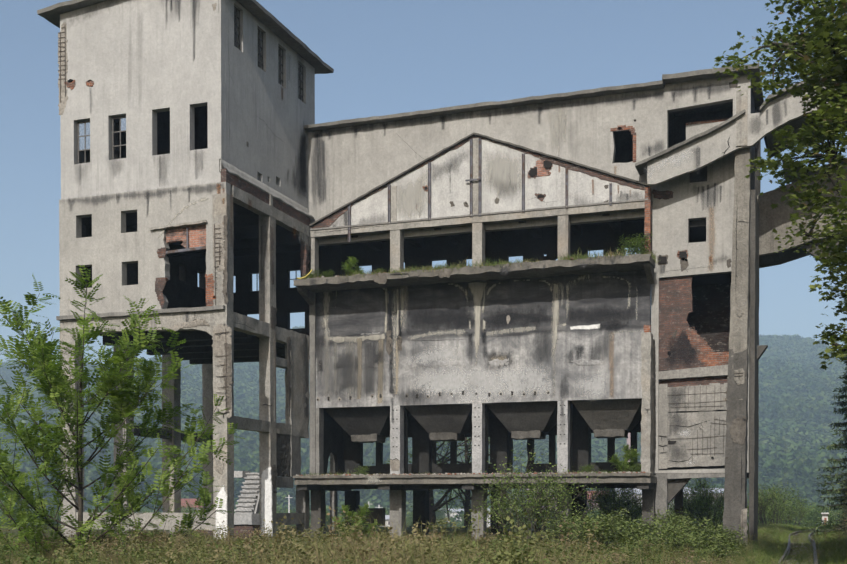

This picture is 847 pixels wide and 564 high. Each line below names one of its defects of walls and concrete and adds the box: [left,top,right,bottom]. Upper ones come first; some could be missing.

spalling [58,22,76,115]
flaking render [527,160,553,179]
flaking render [155,277,168,308]
damp [319,282,536,393]
damp [514,275,600,348]